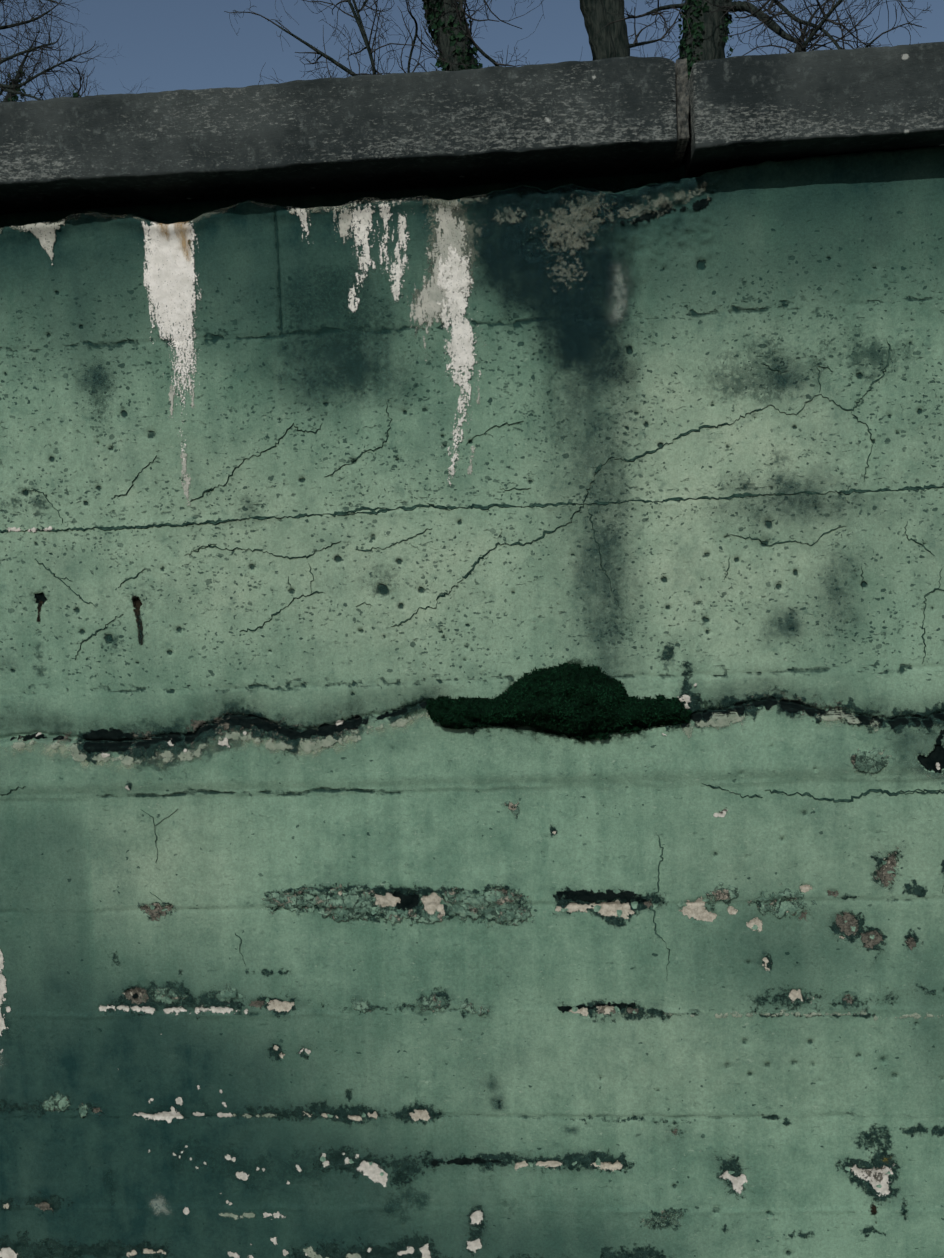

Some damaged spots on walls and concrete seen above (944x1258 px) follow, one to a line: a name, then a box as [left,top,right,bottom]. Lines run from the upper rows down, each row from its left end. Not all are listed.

water stain [0,178,700,505]
crack [0,342,944,662]
spalling [917,730,944,777]
crack [705,784,944,803]
spalling [263,883,533,928]
spalling [553,882,839,931]
peeling [0,949,11,1053]
spalling [99,981,296,1020]
spalling [558,1000,697,1022]
spalling [133,1090,443,1125]
spalling [287,1146,635,1187]
peeling [836,1123,900,1205]